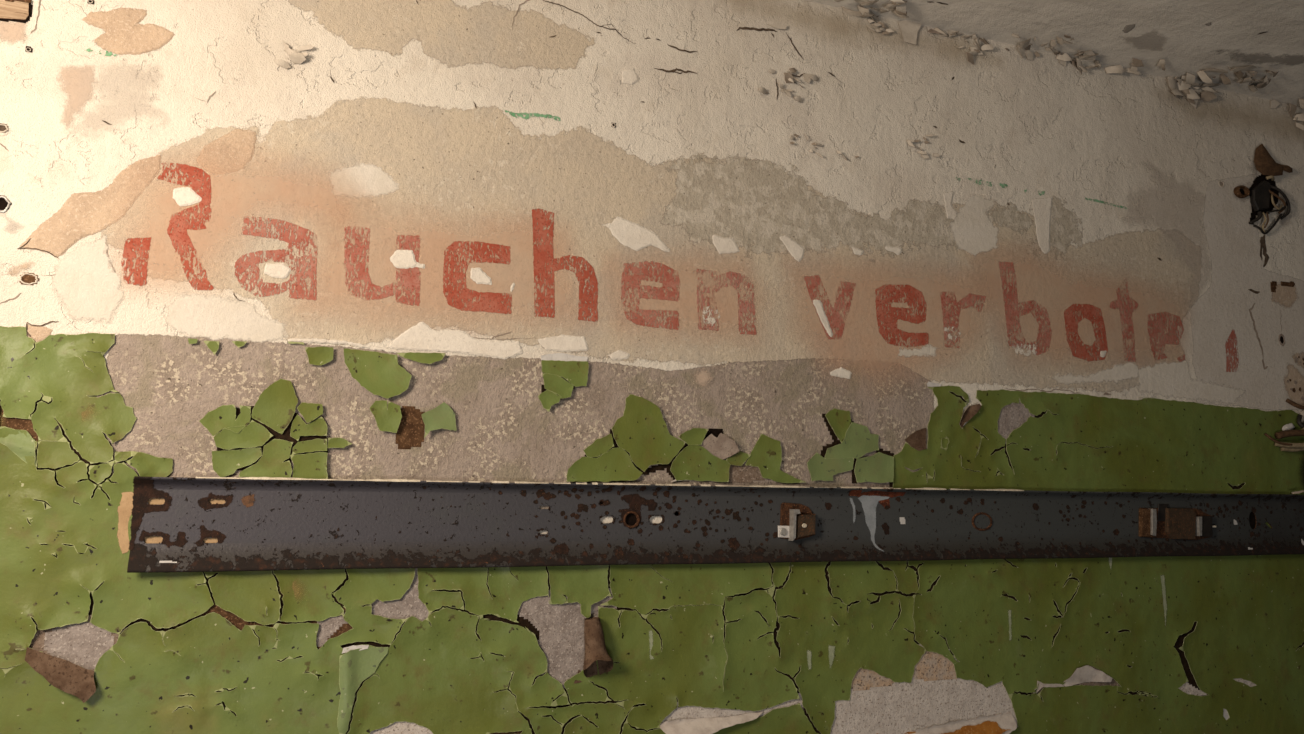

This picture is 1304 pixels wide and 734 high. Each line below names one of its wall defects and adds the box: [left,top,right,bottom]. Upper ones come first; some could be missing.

flaking render [288,0,595,70]
crack [512,0,698,74]
crack [1,238,59,354]
flaking render [20,97,1202,554]
rust [129,479,255,550]
rust [520,486,778,560]
rust [848,488,996,535]
peeling [172,568,434,734]
crack [432,566,653,734]
crack [607,562,821,734]
peeling [653,693,803,734]
peeling [830,644,1018,734]